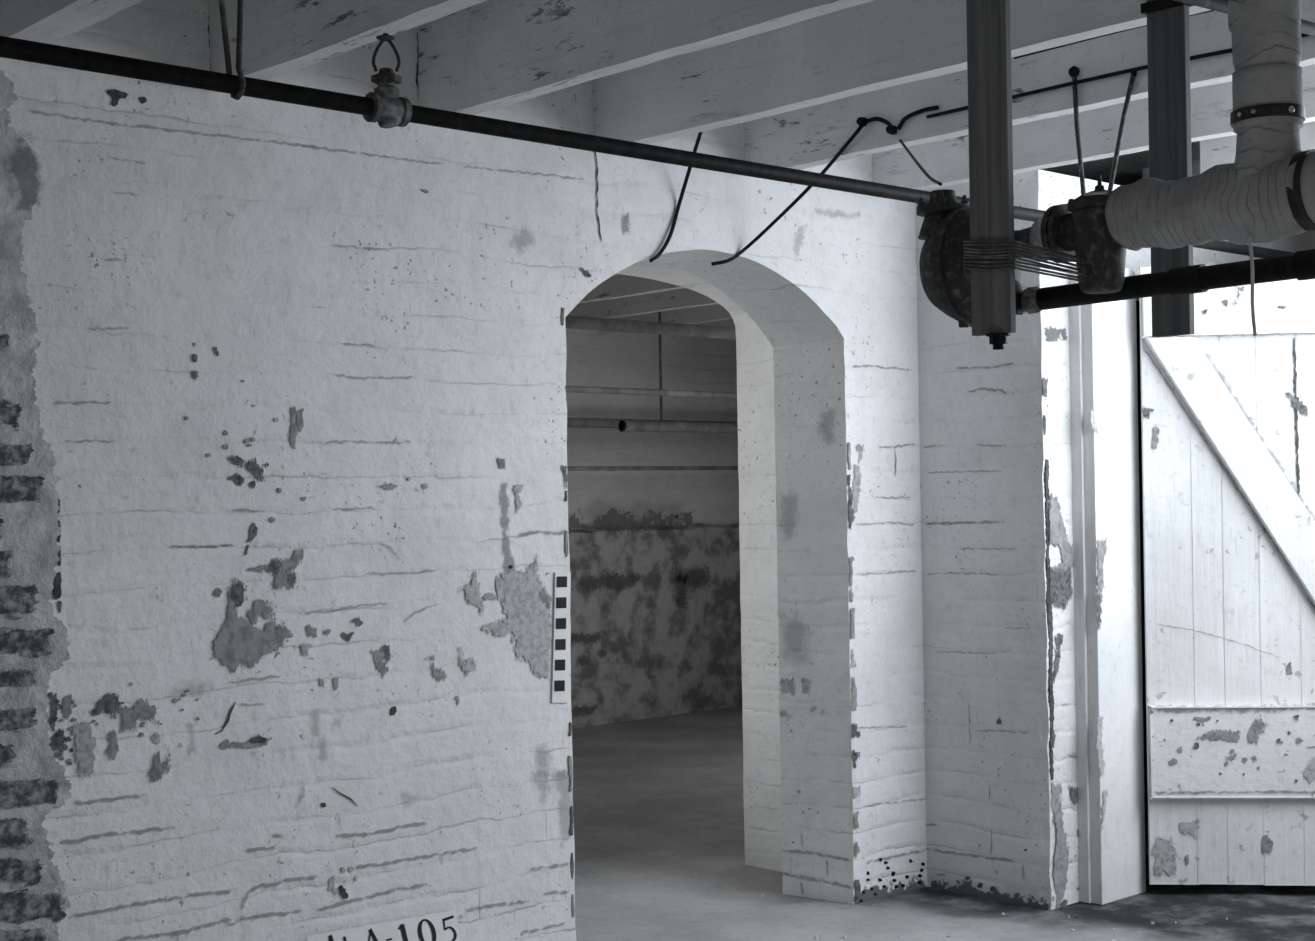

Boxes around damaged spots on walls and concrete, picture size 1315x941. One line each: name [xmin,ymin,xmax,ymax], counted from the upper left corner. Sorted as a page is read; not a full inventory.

flaking render [0,70,171,941]
leakage [568,508,695,536]
flaking render [211,517,363,674]
flaking render [458,554,553,680]
leakage [581,571,643,593]
leakage [672,566,711,608]
leakage [574,703,598,717]
leakage [571,631,607,666]
spalling [849,556,861,768]
spalling [1044,459,1080,909]
peeling [1169,714,1304,775]
peeling [1151,818,1200,877]